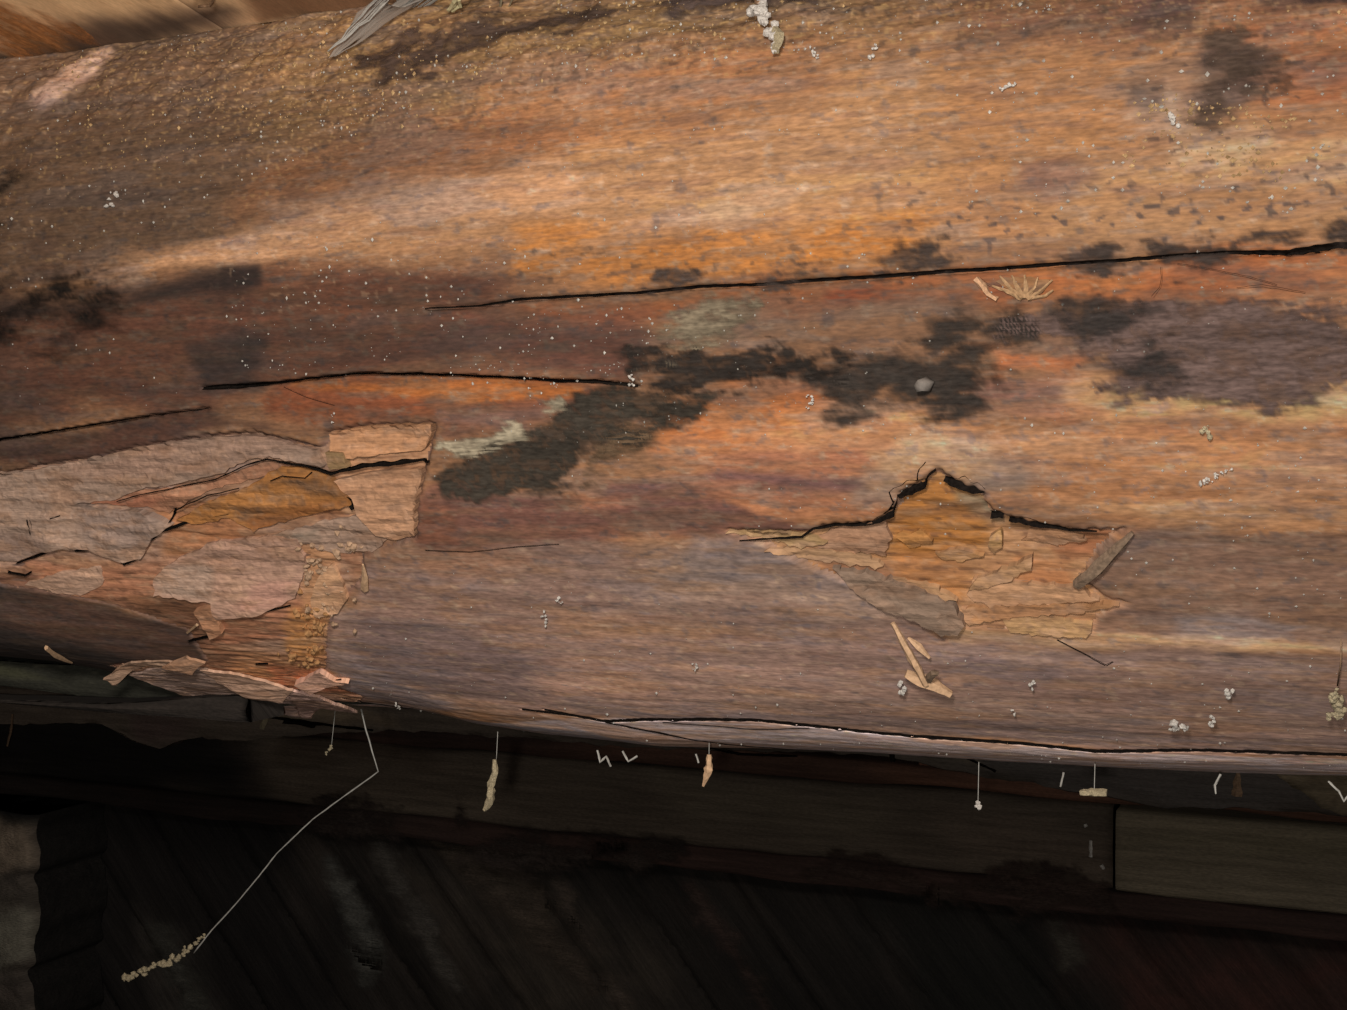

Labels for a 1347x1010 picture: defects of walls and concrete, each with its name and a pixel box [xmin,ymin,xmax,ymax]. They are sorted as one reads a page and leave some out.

crack [425,242,1347,309]
leakage [875,235,951,283]
leakage [1074,243,1122,277]
leakage [1141,240,1231,269]
crack [0,372,638,440]
leakage [433,269,1347,504]
peeling [0,422,437,640]
crack [117,458,430,566]
crack [739,462,1097,541]
peeling [725,520,1120,638]
peeling [294,668,350,695]
crack [522,709,1347,772]